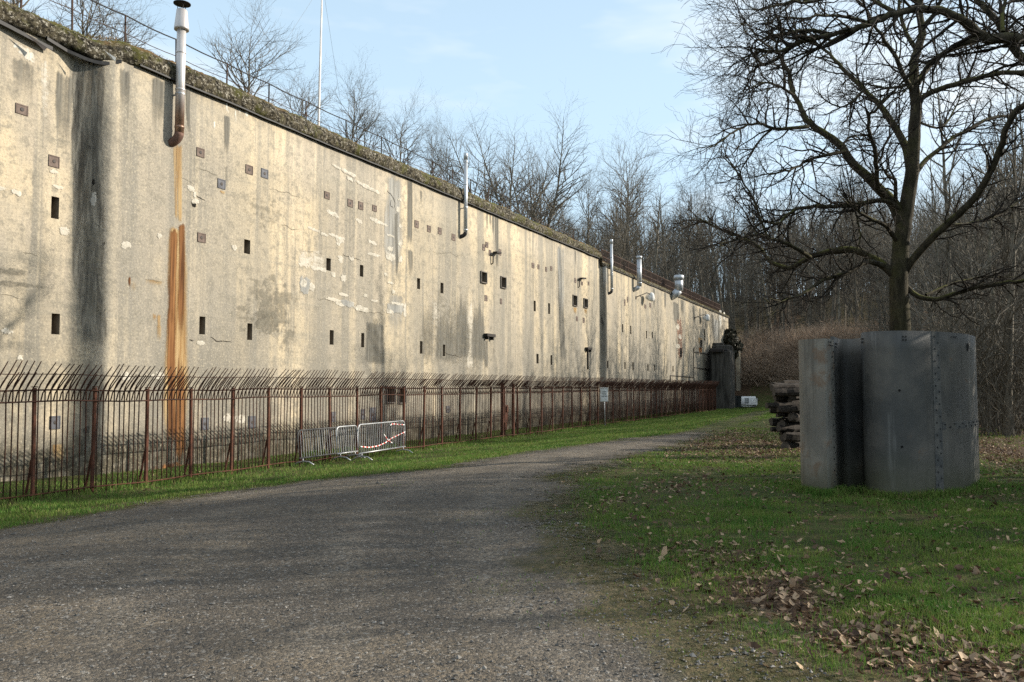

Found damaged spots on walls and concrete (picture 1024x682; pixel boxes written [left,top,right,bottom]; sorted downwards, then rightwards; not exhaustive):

leakage [14,43,106,339]
leakage [84,370,104,450]
rust [146,146,187,468]
peeling [299,198,406,317]